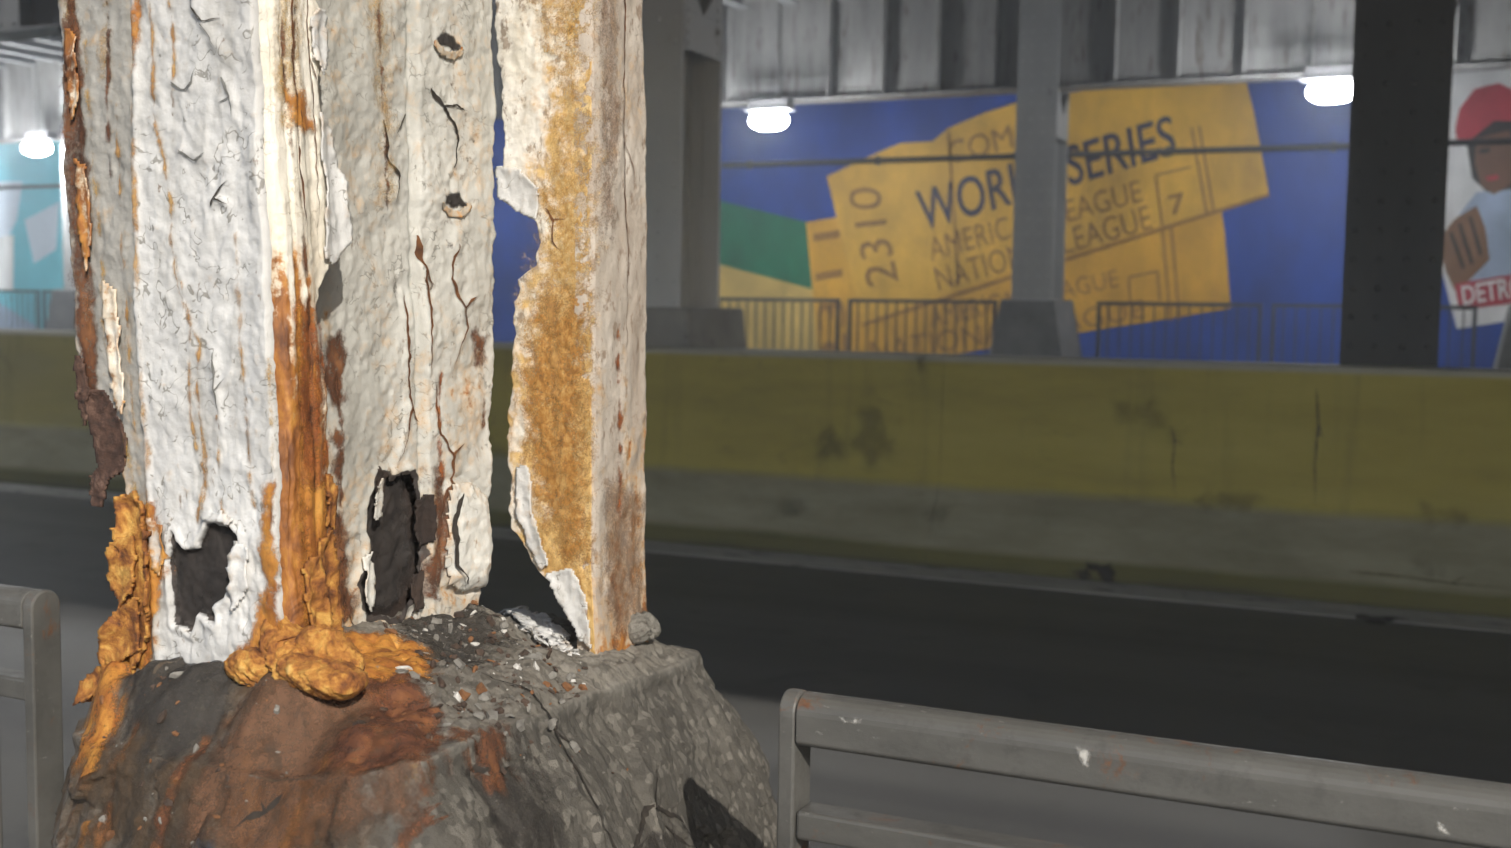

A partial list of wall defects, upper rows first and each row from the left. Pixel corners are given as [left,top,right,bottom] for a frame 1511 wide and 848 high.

crack [178,150,226,206]
crack [291,0,321,438]
crack [383,88,467,198]
peeling [101,280,125,414]
crack [403,235,476,503]
rust [72,484,167,779]
peeling [200,510,249,611]
rust [238,473,281,650]
rust [293,294,357,626]
peeling [362,551,376,612]
peeling [373,478,384,520]
rust [151,671,509,848]